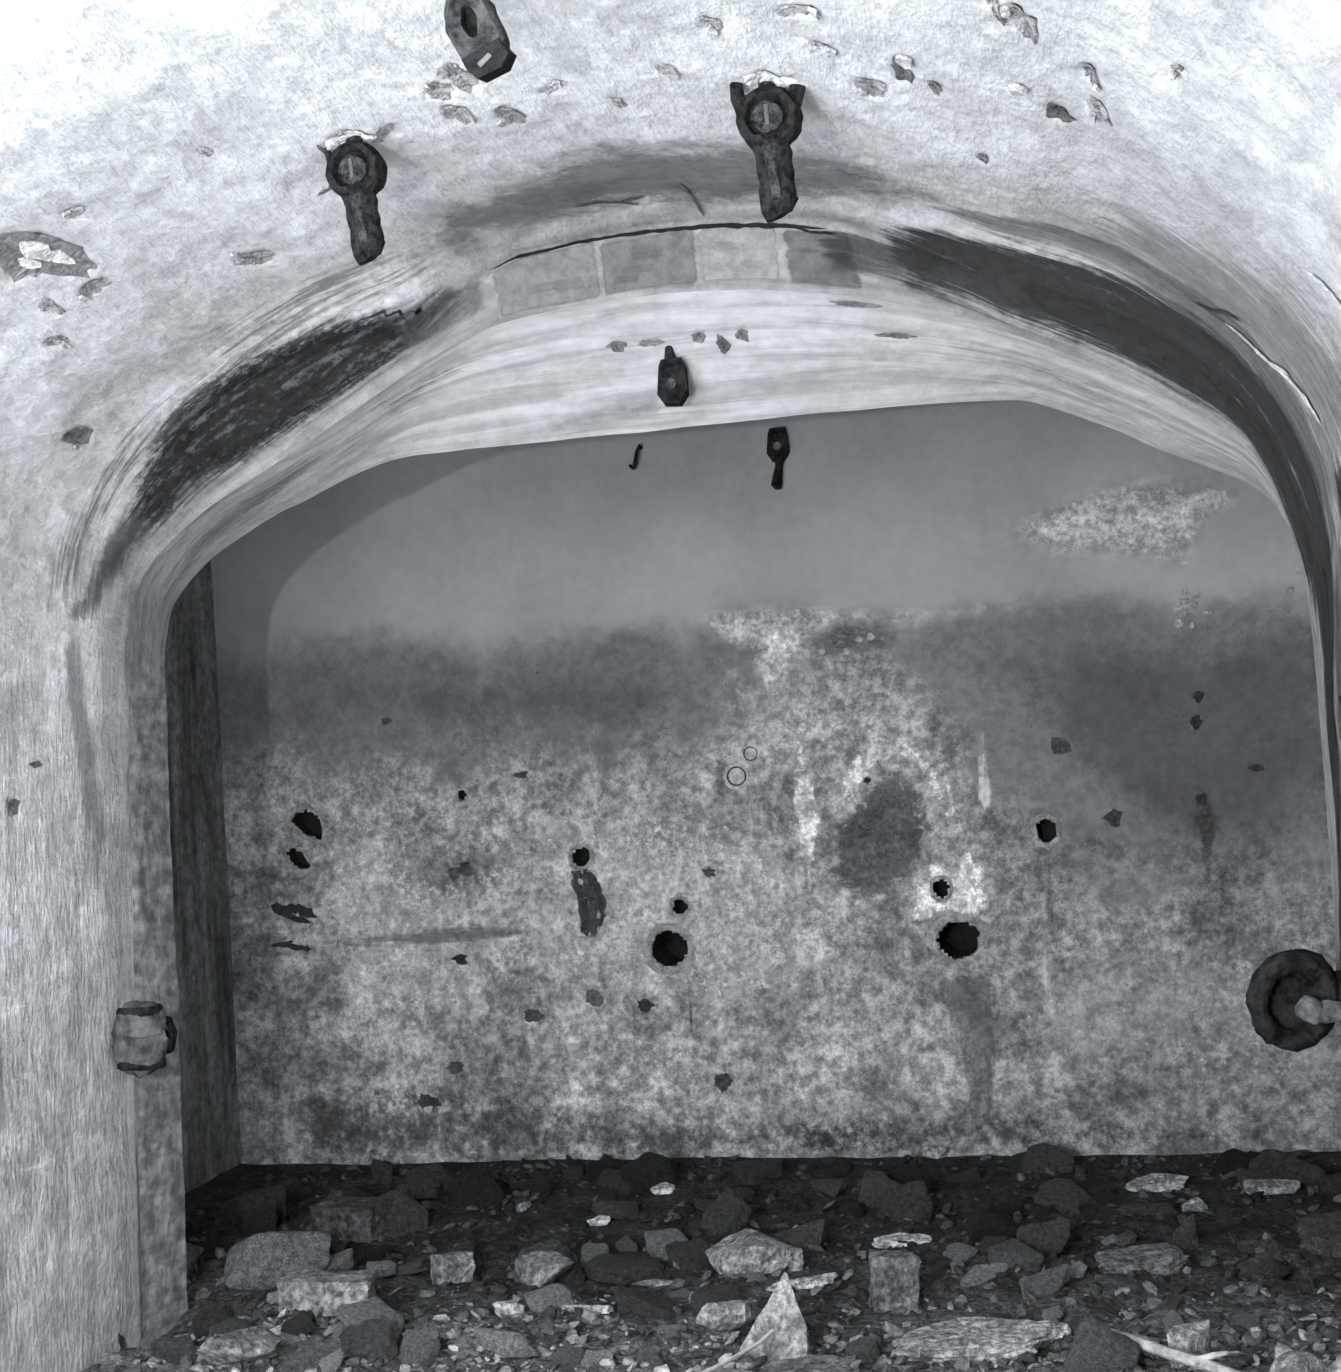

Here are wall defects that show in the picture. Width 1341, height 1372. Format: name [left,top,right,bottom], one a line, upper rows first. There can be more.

spalling [39,298,66,315]
spalling [0,232,112,303]
damp [173,267,480,466]
damp [186,462,312,561]
damp [793,209,1341,972]
damp [713,613,899,698]
damp [1043,959,1054,1015]